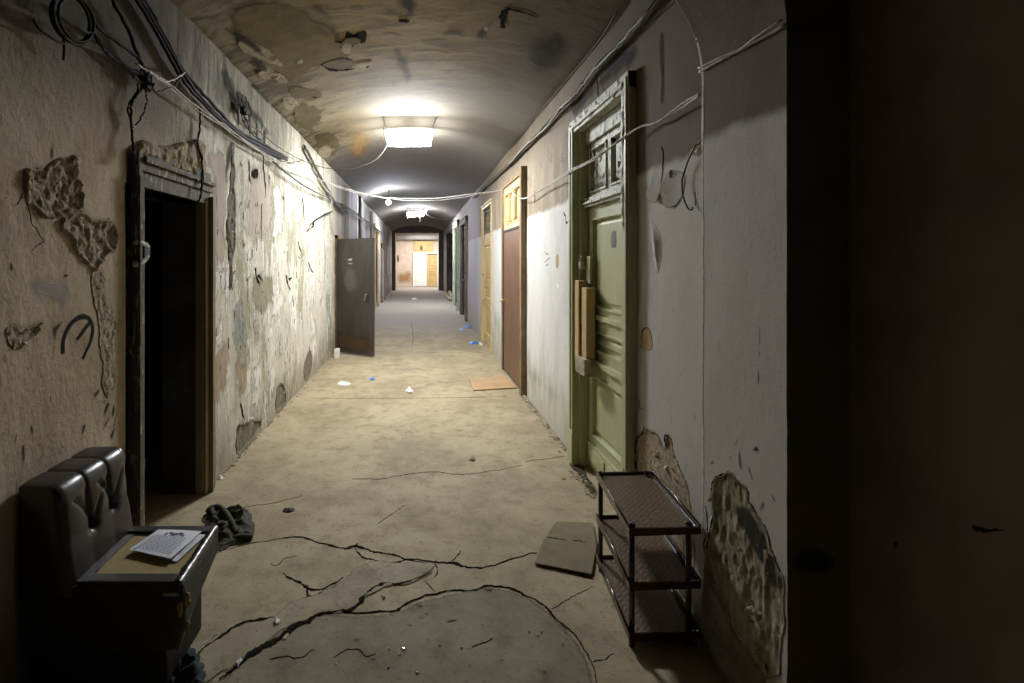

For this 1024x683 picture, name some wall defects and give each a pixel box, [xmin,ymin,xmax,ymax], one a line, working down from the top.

peeling [238,37,340,158]
spalling [4,322,44,362]
spalling [22,155,119,398]
spalling [132,139,330,455]
spalling [634,426,691,512]
crack [197,536,613,682]
spalling [670,472,786,678]